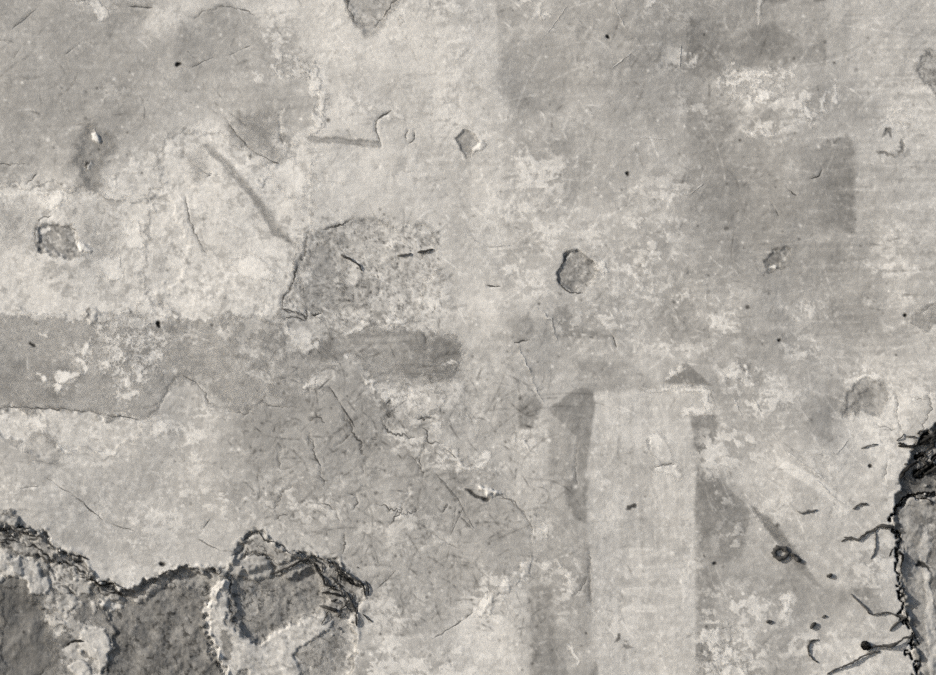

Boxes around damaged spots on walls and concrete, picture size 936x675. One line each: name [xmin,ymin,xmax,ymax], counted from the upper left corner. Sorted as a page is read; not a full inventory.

spalling [346,0,404,36]
spalling [0,508,372,675]
flaking render [887,423,936,675]